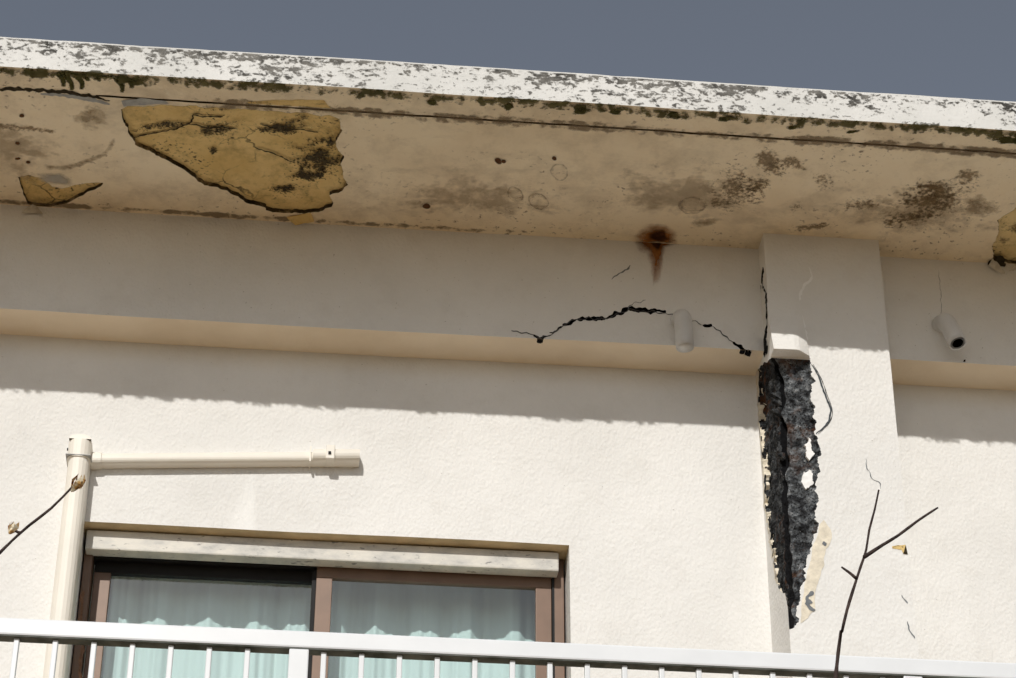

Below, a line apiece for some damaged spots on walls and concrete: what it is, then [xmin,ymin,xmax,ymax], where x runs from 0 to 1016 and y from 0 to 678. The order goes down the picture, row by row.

peeling [0,86,110,105]
peeling [18,175,103,214]
peeling [121,98,348,225]
water stain [887,170,989,226]
rust [639,227,672,274]
peeling [988,208,1016,274]
crack [511,268,768,358]
crack [799,268,833,434]
spalling [756,358,832,629]